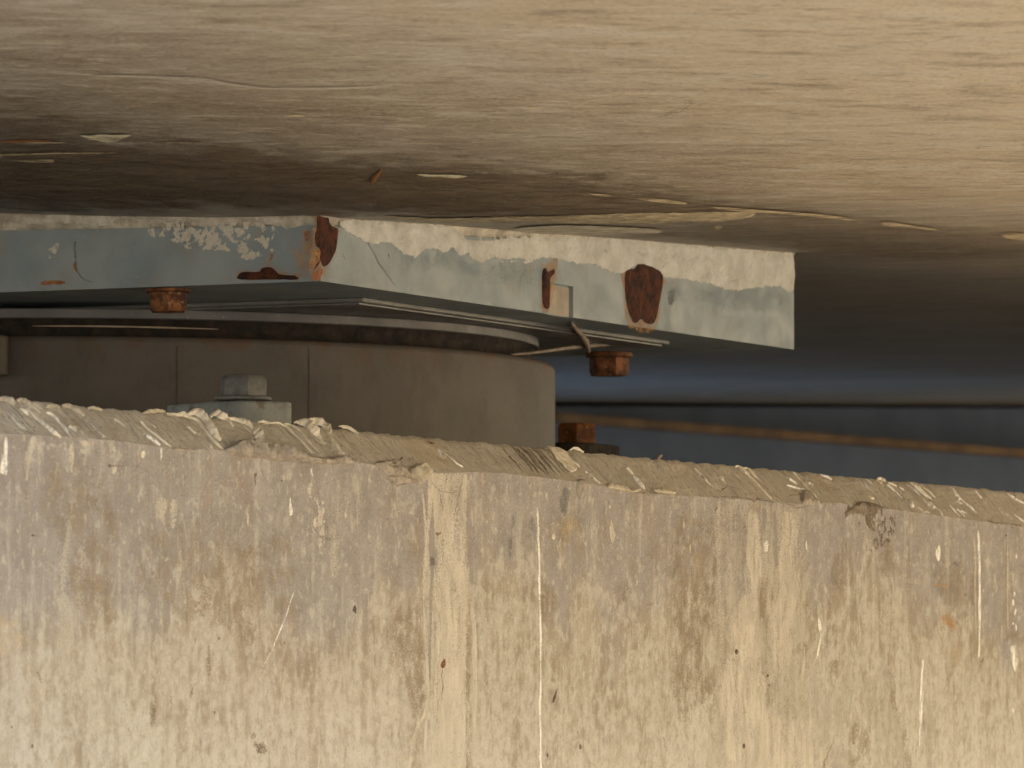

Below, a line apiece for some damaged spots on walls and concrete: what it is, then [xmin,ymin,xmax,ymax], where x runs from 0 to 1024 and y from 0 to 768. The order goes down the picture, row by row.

peeling [0,213,307,260]
rust [231,215,340,282]
peeling [387,201,756,235]
rust [541,258,558,313]
rust [621,264,666,333]
peeling [547,446,587,499]
damp [0,396,360,660]
spalling [845,501,896,551]
damp [383,437,488,768]
damp [526,487,587,768]
damp [667,465,912,768]
damp [862,477,1024,668]